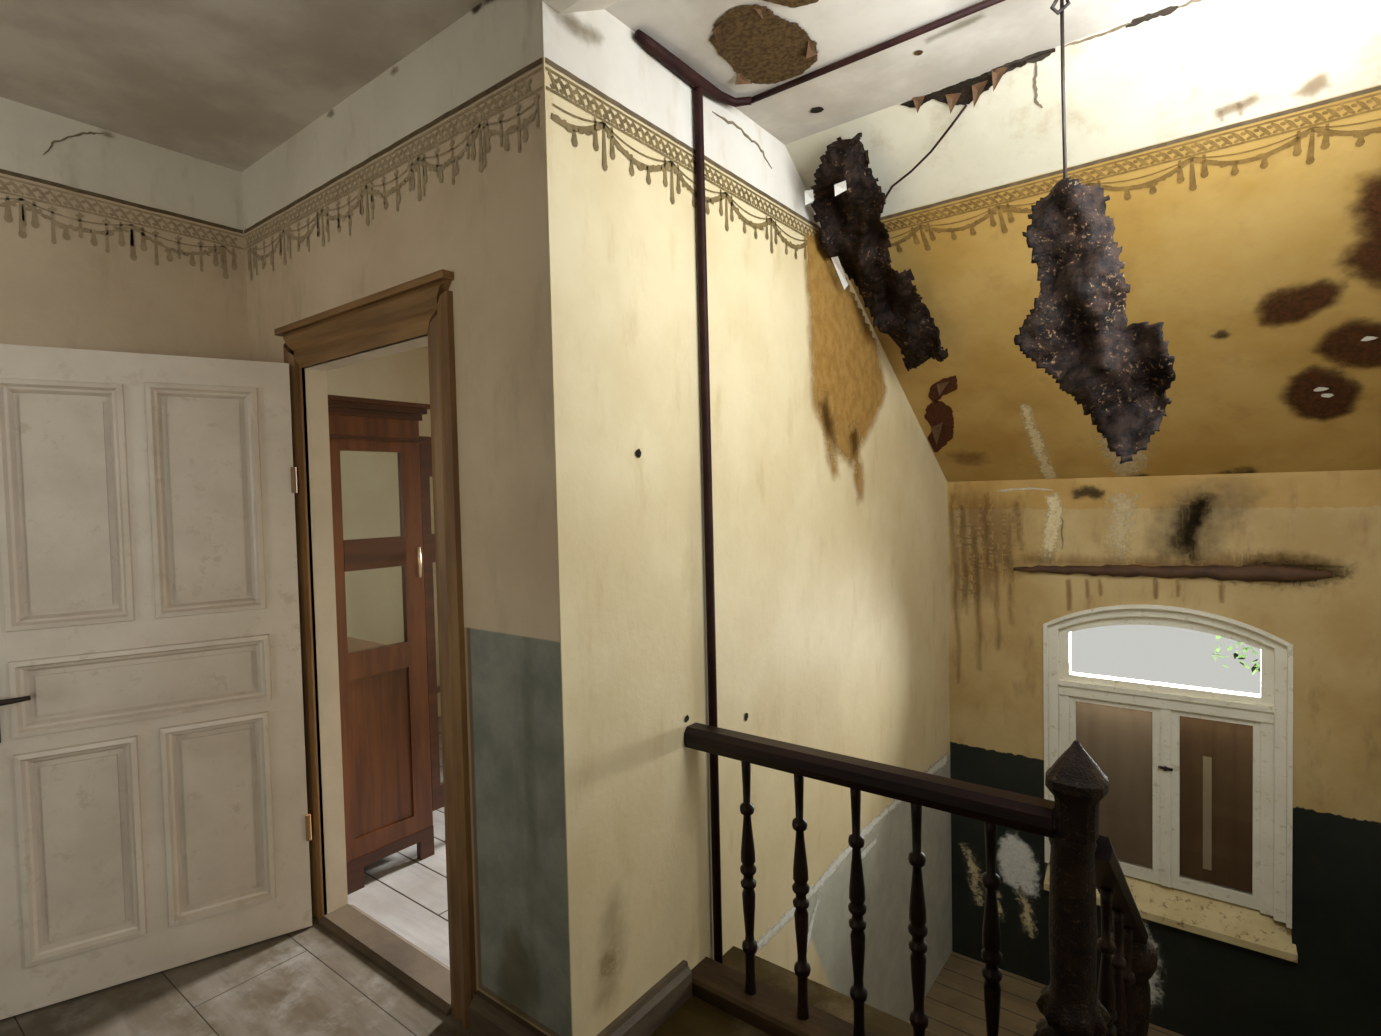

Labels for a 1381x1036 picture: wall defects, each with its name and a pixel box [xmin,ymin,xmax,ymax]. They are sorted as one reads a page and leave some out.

spalling [709,0,819,85]
flaking render [901,48,1055,114]
peeling [924,376,958,453]
damp [1184,500,1206,562]
flaking render [962,834,1039,938]
flaking render [1146,928,1160,1001]